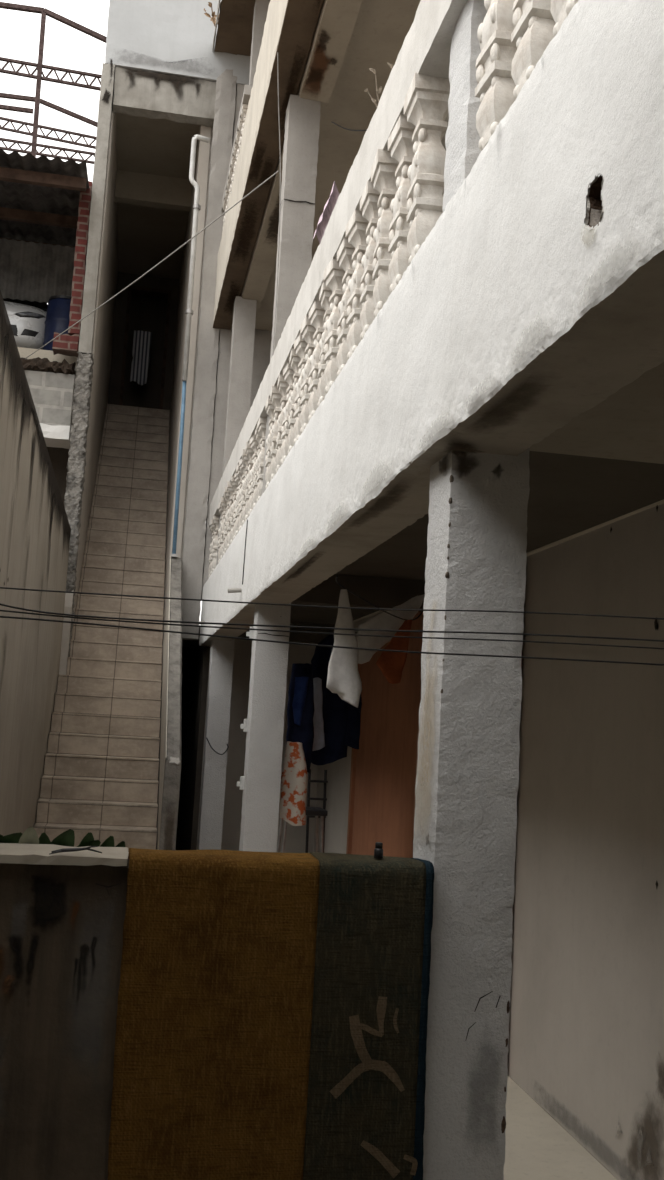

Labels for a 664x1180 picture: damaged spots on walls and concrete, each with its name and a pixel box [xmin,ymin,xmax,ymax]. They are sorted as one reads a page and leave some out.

spalling [583,174,604,242]
damp [356,489,403,524]
damp [286,557,318,581]